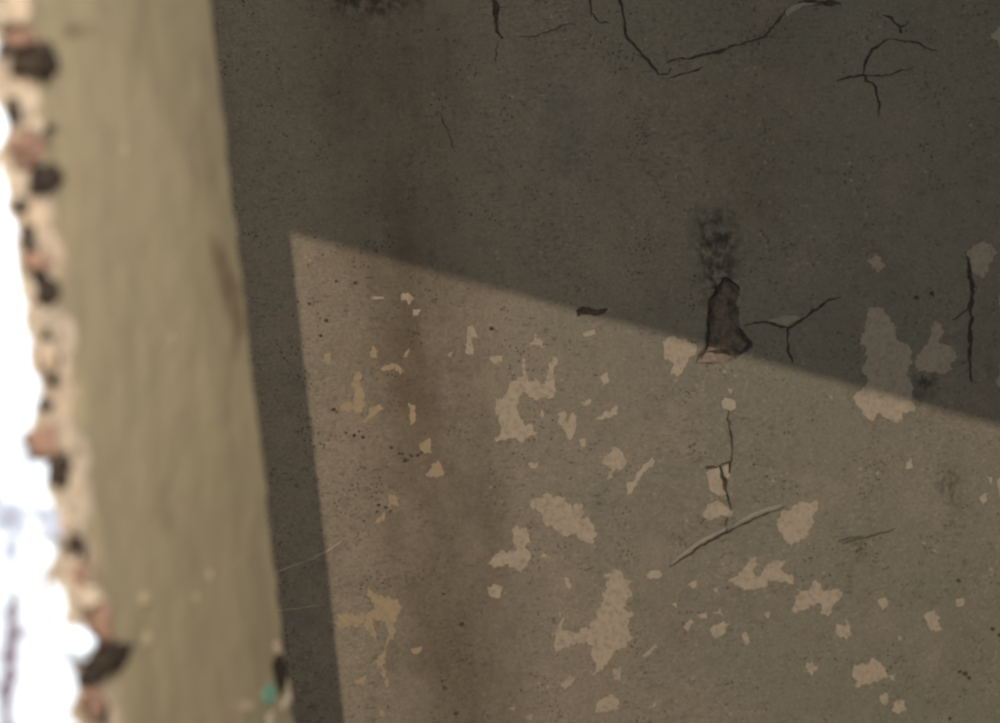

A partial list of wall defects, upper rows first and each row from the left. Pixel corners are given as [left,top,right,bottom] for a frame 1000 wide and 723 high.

spalling [0,0,60,79]
crack [492,0,841,78]
crack [837,14,937,118]
spalling [5,96,65,310]
spalling [663,276,753,376]
crack [744,297,841,364]
peeling [853,306,958,423]
crack [951,252,975,382]
crack [670,410,785,567]
spalling [0,423,135,723]
peeling [552,568,634,681]
peeling [729,557,852,641]